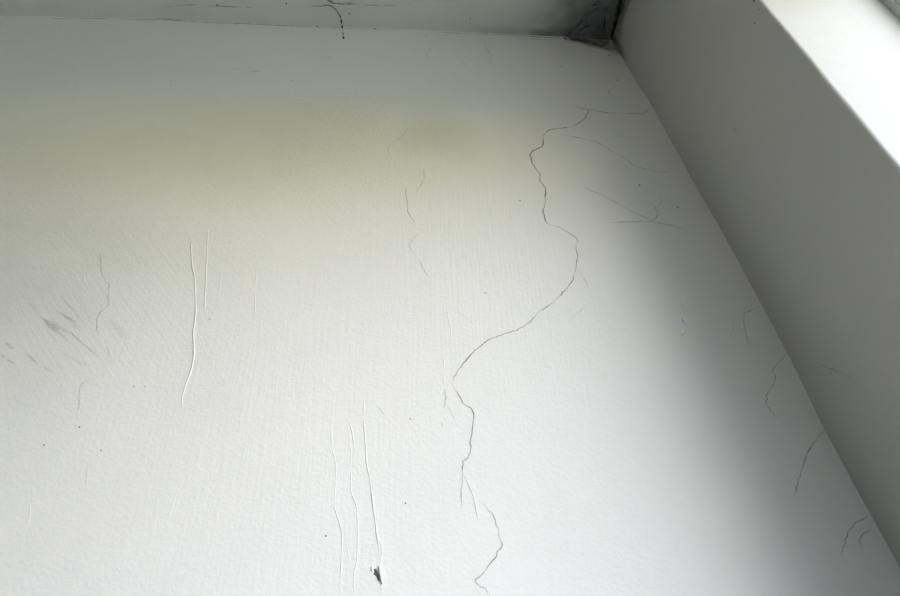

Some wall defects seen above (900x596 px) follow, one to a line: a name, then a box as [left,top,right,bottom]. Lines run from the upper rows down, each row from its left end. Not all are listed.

crack [445,108,606,489]